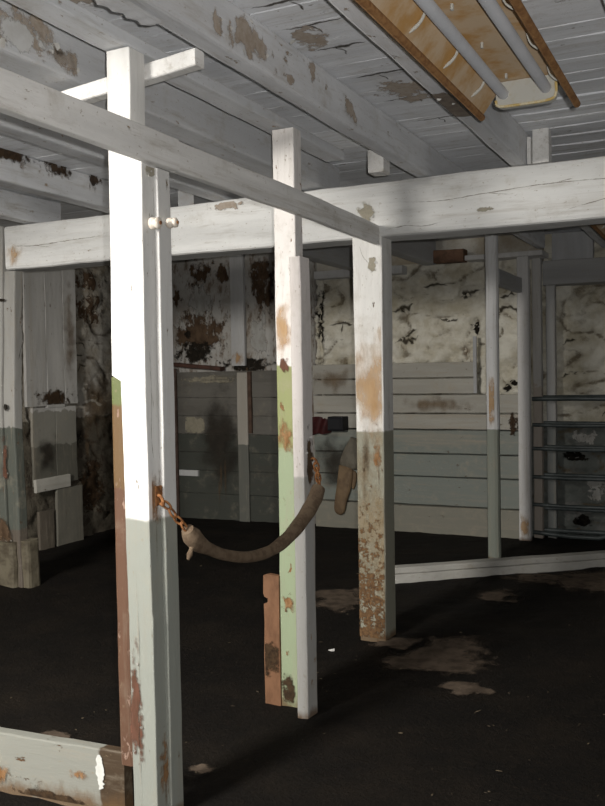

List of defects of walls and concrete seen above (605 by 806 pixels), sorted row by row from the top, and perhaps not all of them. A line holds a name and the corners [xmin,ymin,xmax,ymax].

peeling [0,4,80,76]
peeling [212,9,274,61]
peeling [290,25,328,51]
peeling [75,270,103,326]
peeling [187,261,229,288]
peeling [248,252,275,321]
peeling [172,290,227,363]
rust [276,308,289,347]
rust [356,357,382,421]
rust [278,423,292,451]
rust [358,497,385,639]